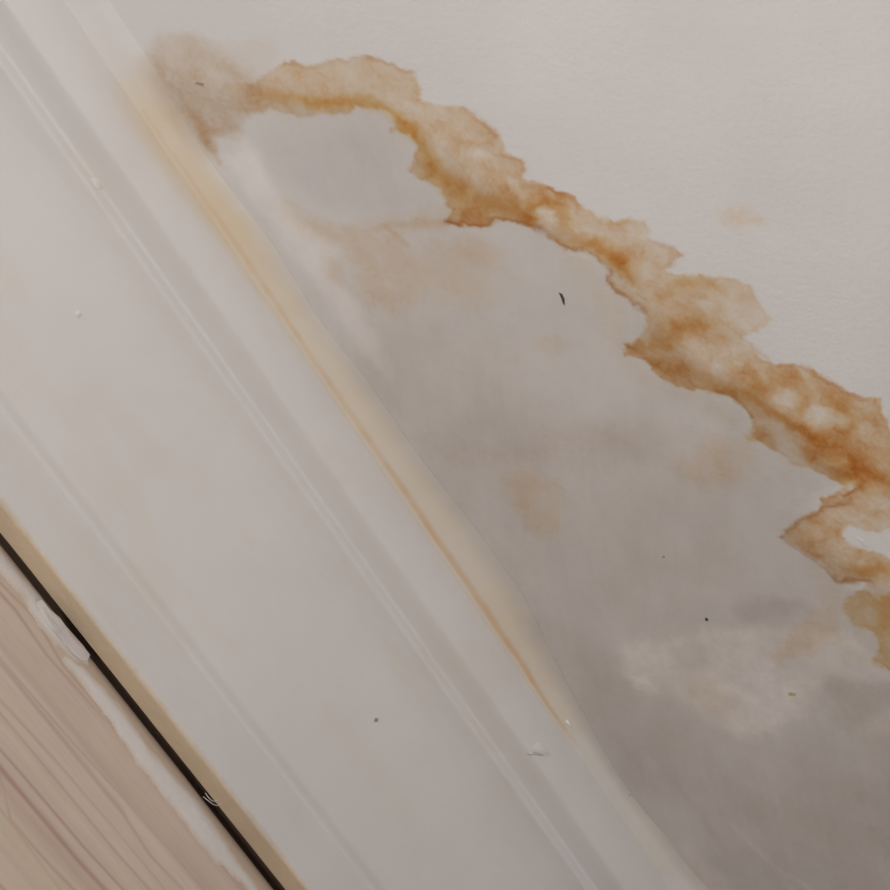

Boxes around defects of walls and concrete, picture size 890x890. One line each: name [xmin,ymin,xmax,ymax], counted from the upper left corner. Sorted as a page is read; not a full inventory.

water stain [81,18,708,890]
water stain [426,425,890,890]